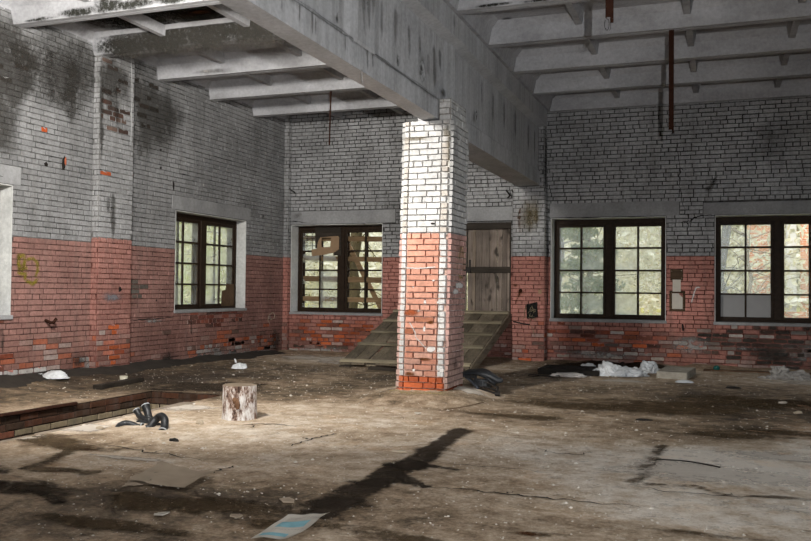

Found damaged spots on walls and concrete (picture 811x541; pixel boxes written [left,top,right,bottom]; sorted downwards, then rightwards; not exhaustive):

damp [0,0,259,150]
peeling [547,322,811,370]